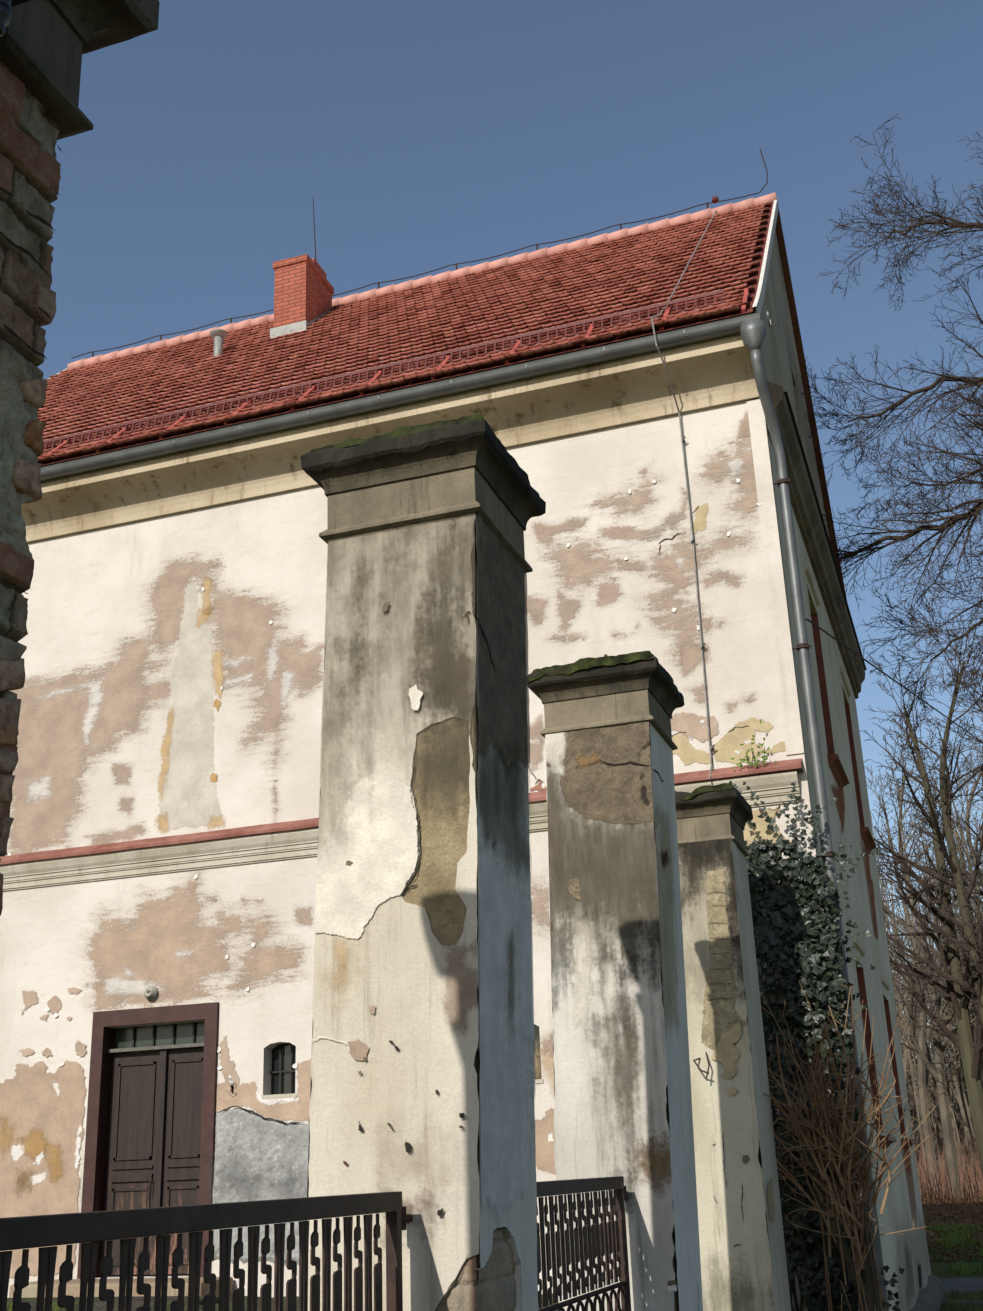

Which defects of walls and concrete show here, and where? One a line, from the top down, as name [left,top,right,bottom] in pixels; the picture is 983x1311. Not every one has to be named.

flaking render [0,60,325,916]
peeling [21,872,306,1022]
damp [479,749,530,868]
peeling [293,412,792,1311]
damp [547,772,660,1105]
peeling [0,1041,87,1218]
flaking render [212,1037,311,1204]
damp [543,1035,554,1072]
peeling [0,1244,76,1278]
flaking render [211,1220,306,1266]